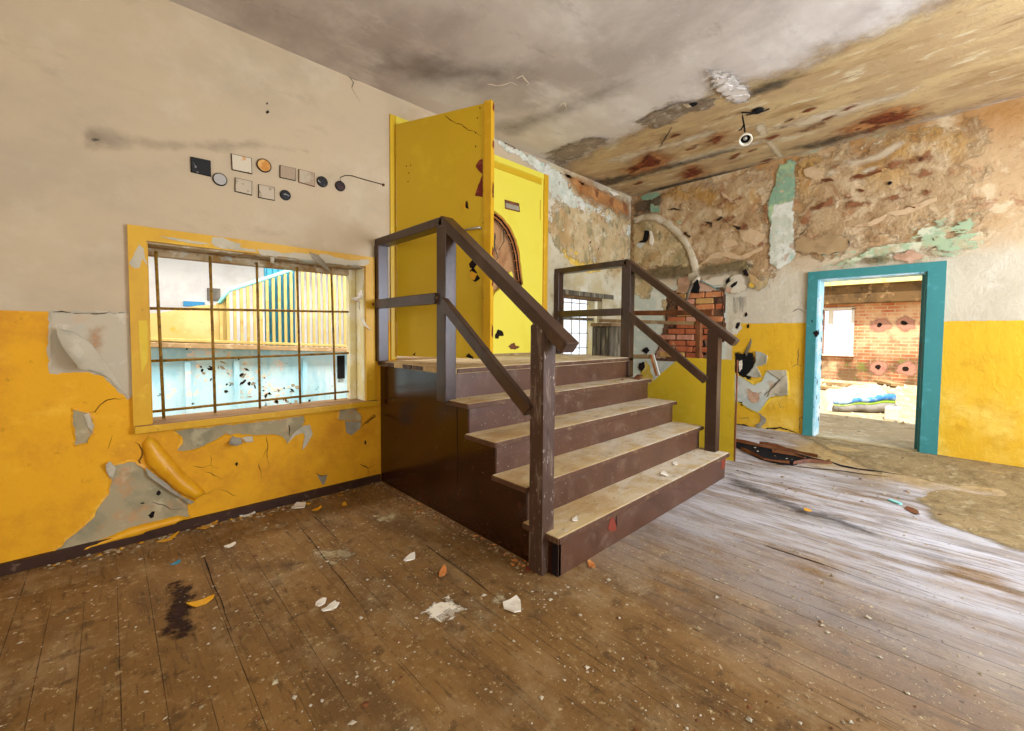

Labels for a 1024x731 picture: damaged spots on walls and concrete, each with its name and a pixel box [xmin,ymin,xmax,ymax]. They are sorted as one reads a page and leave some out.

peeling [706,69,750,104]
rust [840,105,924,134]
rust [625,151,670,185]
rust [679,166,704,179]
spalling [789,116,995,262]
spalling [548,166,791,427]
peeling [47,310,148,400]
peeling [173,348,313,453]
peeling [70,408,96,447]
peeling [337,408,362,435]
peeling [52,459,191,551]